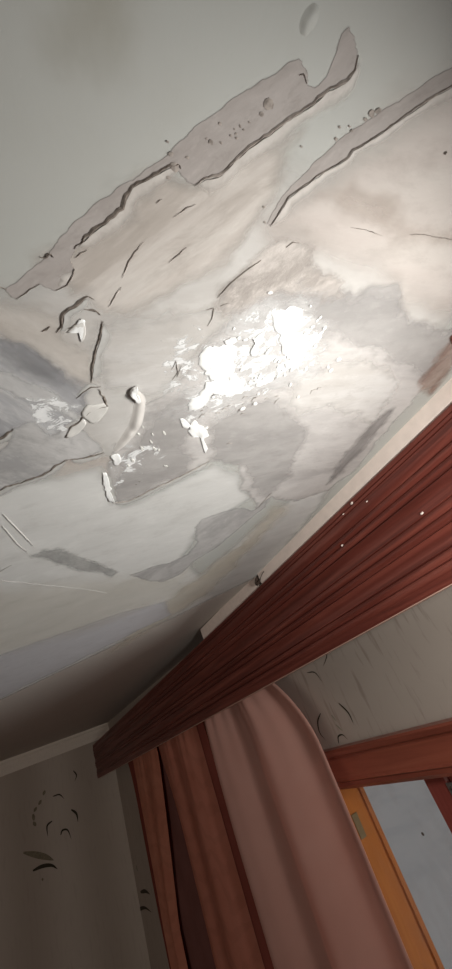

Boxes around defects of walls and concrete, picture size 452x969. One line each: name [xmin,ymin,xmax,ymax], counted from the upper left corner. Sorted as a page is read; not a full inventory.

peeling [0,28,452,582]
water stain [0,340,86,437]
corrosion [421,335,452,393]
water stain [331,410,392,480]
water stain [0,511,281,698]